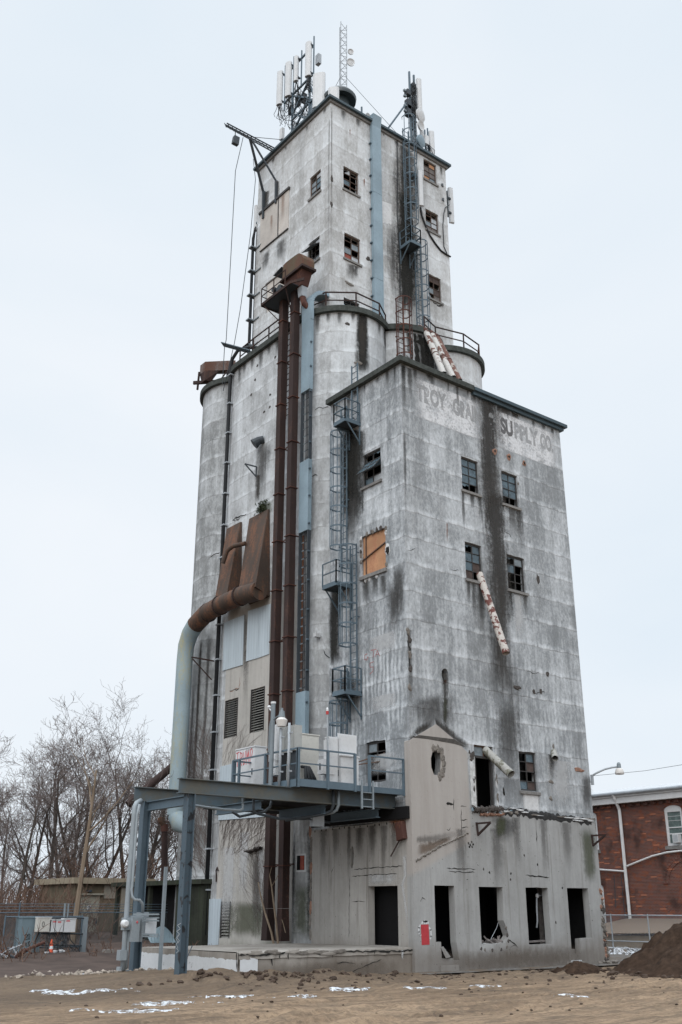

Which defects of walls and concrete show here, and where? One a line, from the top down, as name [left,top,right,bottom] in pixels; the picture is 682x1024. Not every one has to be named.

water stain [391,141,416,307]
water stain [316,313,386,370]
water stain [448,383,527,692]
spalling [431,744,446,782]
water stain [500,713,517,763]
water stain [496,819,513,833]
water stain [584,836,593,873]